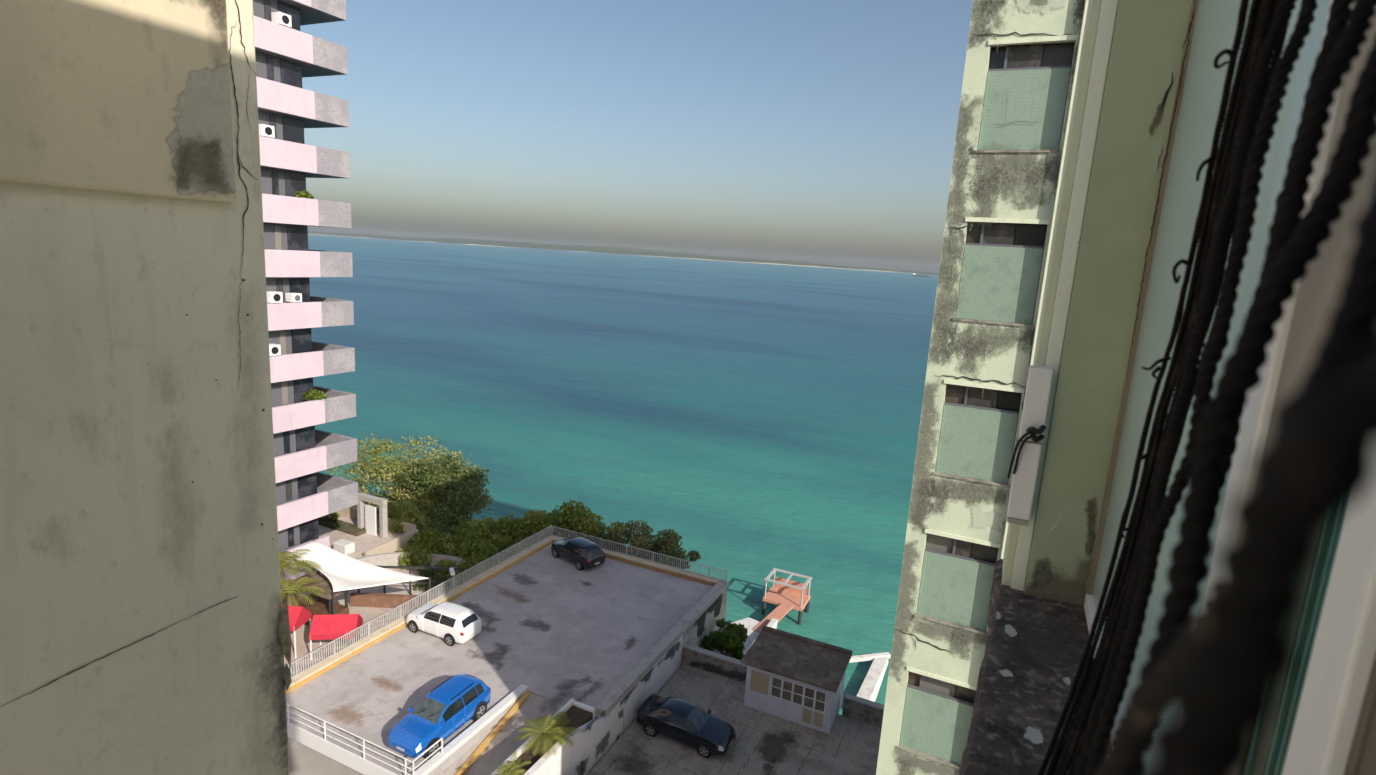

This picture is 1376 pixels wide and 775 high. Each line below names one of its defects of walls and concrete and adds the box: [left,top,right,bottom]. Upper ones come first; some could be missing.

damp [203,0,227,37]
damp [968,0,1006,48]
damp [1074,0,1085,19]
peeling [167,65,236,195]
crack [229,0,259,390]
damp [929,98,1061,378]
crack [1127,1,1196,373]
damp [889,384,1009,682]
damp [1025,499,1097,607]
crack [1,596,238,707]
damp [996,611,1018,637]